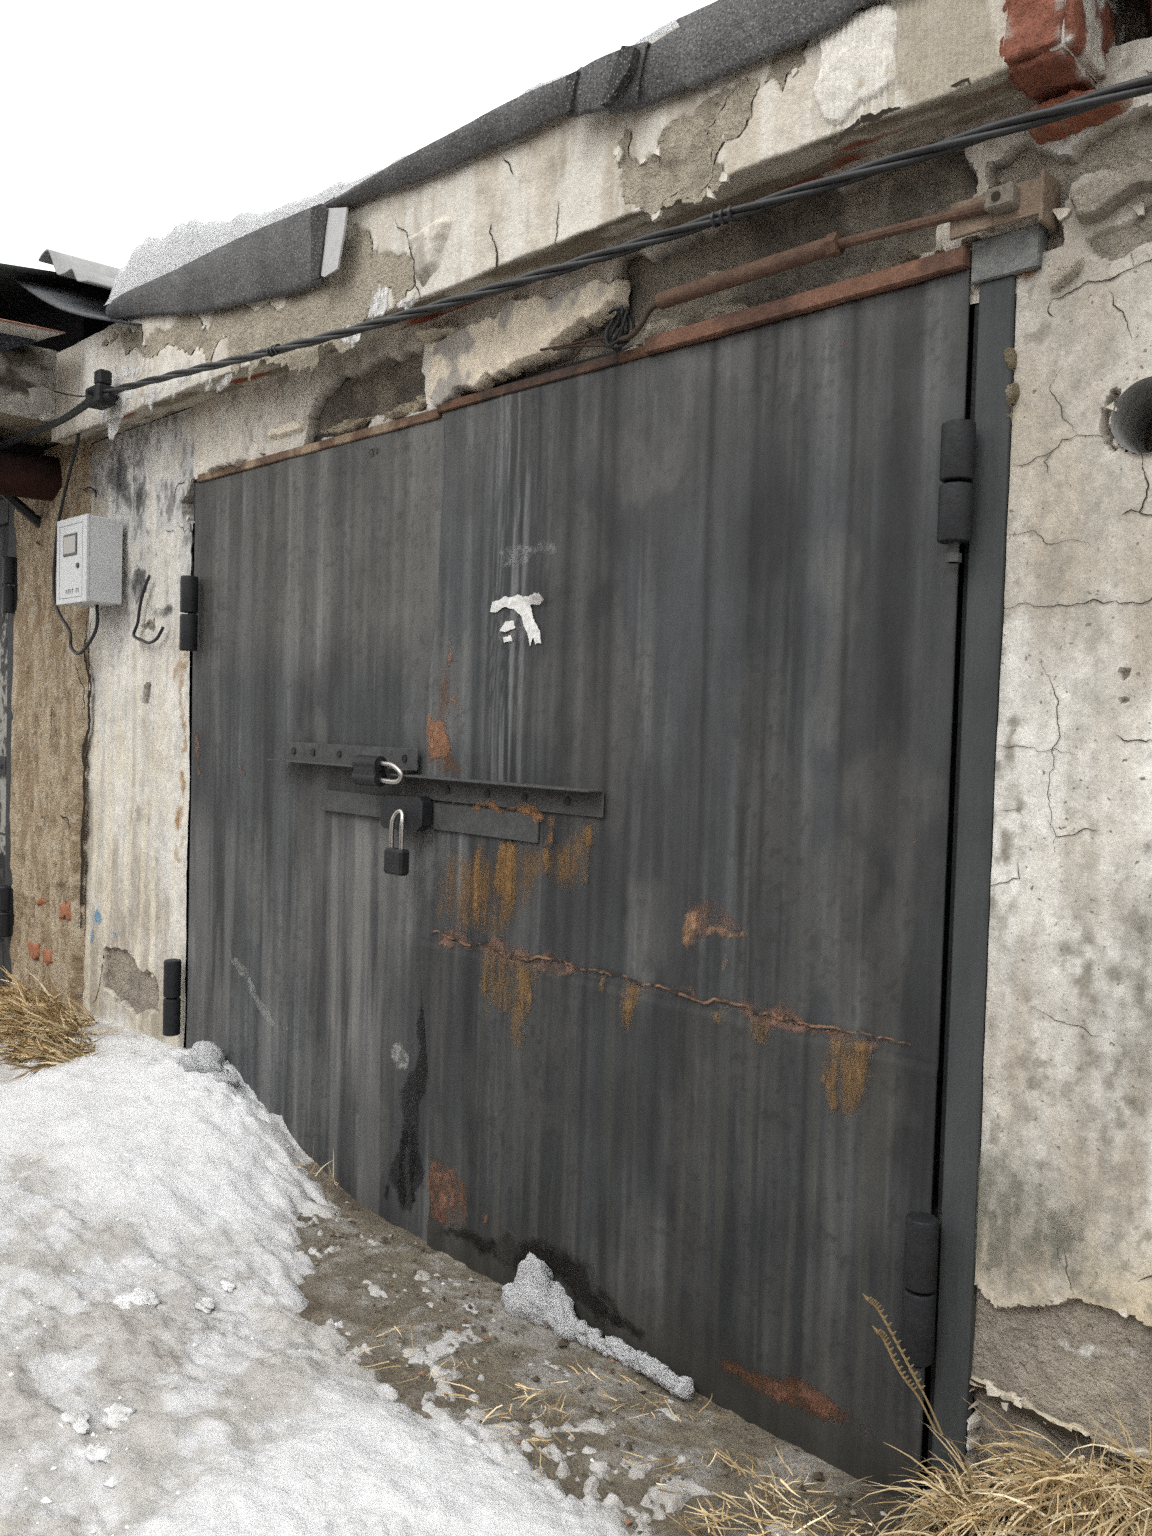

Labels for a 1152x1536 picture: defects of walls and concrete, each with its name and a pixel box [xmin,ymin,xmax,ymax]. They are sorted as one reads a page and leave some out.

spalling [523,0,1152,377]
peeling [100,223,426,439]
crack [1123,453,1152,516]
crack [1003,598,1152,609]
crack [996,665,1100,842]
spalling [108,948,159,1014]
rust [439,842,575,1045]
rust [683,904,742,943]
rust [742,1003,874,1109]
rust [724,1363,844,1420]
spalling [966,1288,1152,1486]
crack [969,1378,1151,1463]